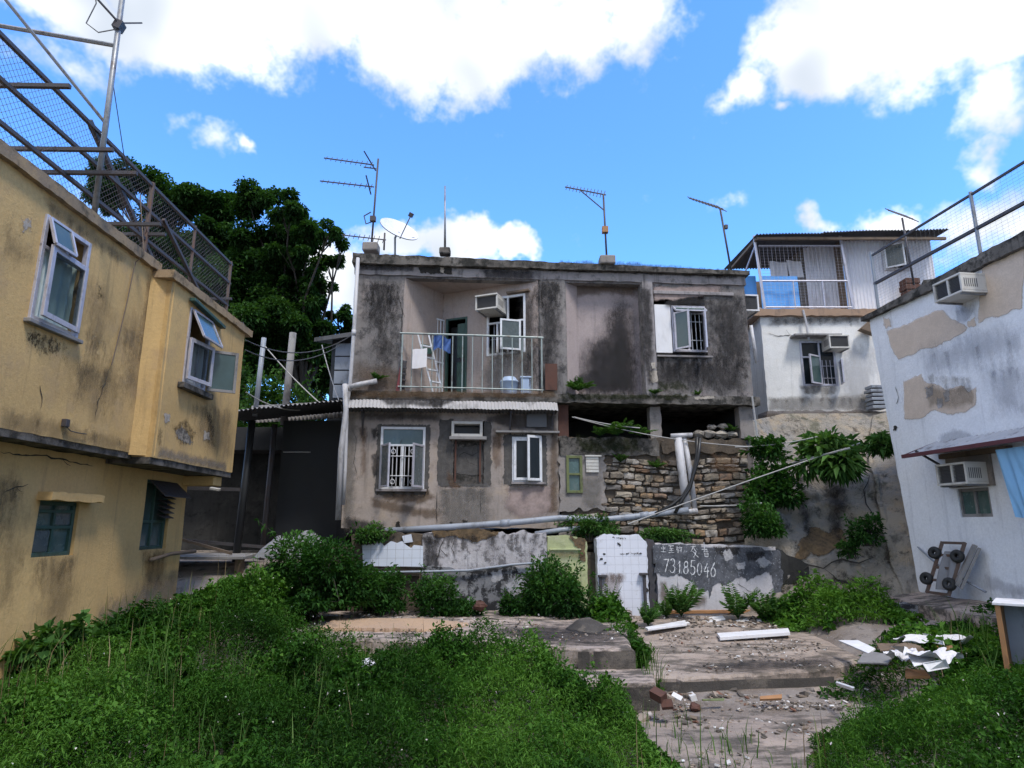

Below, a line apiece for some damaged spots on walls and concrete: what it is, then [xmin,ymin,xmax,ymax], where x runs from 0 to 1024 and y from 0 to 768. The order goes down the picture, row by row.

peeling [883,249,1024,359]
damp [364,285,399,365]
damp [579,289,751,394]
peeling [893,375,976,431]
crack [1,452,90,466]
spalling [431,519,499,542]
peeling [491,565,535,596]
peeling [723,549,772,570]
crack [805,557,874,583]